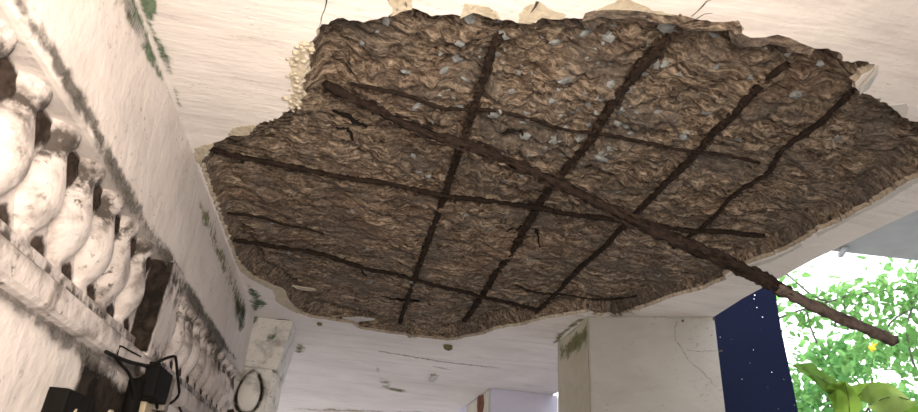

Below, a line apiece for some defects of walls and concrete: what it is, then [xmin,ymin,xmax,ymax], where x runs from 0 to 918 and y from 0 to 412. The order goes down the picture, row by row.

spalling [193,0,918,341]